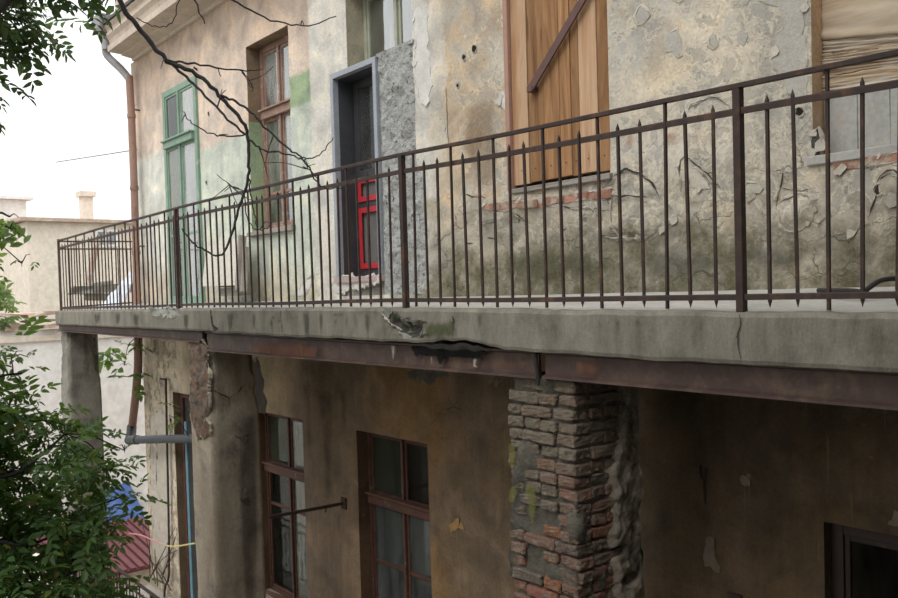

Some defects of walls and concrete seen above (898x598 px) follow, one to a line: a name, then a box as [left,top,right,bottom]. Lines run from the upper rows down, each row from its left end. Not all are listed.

peeling [744,0,810,97]
crack [677,157,719,190]
crack [773,173,809,205]
crack [869,169,897,215]
spalling [381,307,429,338]
crack [734,314,742,363]
flaking render [188,339,213,441]
peeling [252,357,267,414]